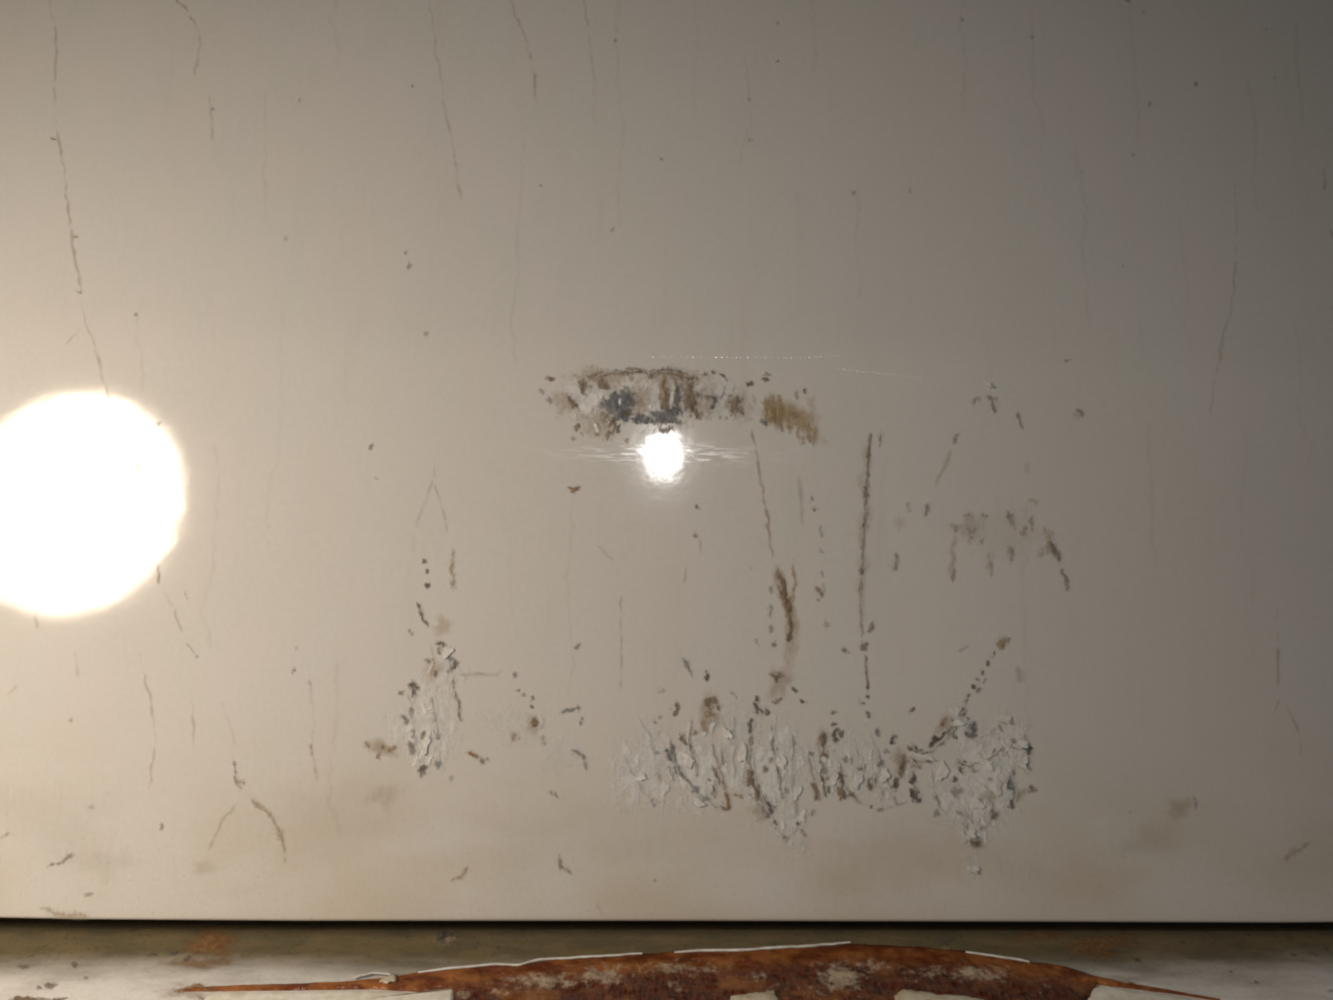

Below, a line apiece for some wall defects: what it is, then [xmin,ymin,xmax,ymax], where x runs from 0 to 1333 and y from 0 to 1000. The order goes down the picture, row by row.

peeling [548,368,769,440]
rust [779,568,795,641]
peeling [385,642,460,776]
peeling [610,673,1034,876]
rust [174,941,1220,1000]